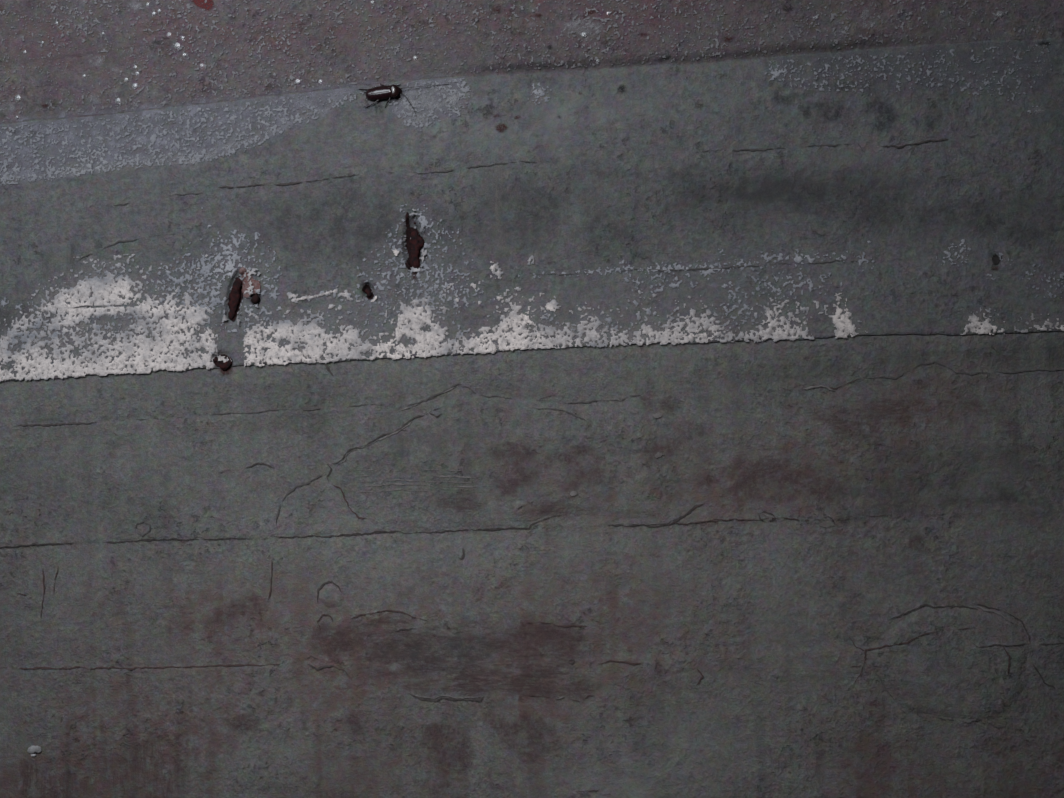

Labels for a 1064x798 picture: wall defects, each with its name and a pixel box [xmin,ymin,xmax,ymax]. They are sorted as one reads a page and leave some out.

water stain [146,225,282,333]
water stain [356,204,483,327]
water stain [533,241,874,325]
crack [0,420,96,428]
crack [536,393,644,421]
crack [108,383,580,560]
crack [611,504,890,528]
crack [0,542,77,618]
crack [848,604,1062,728]